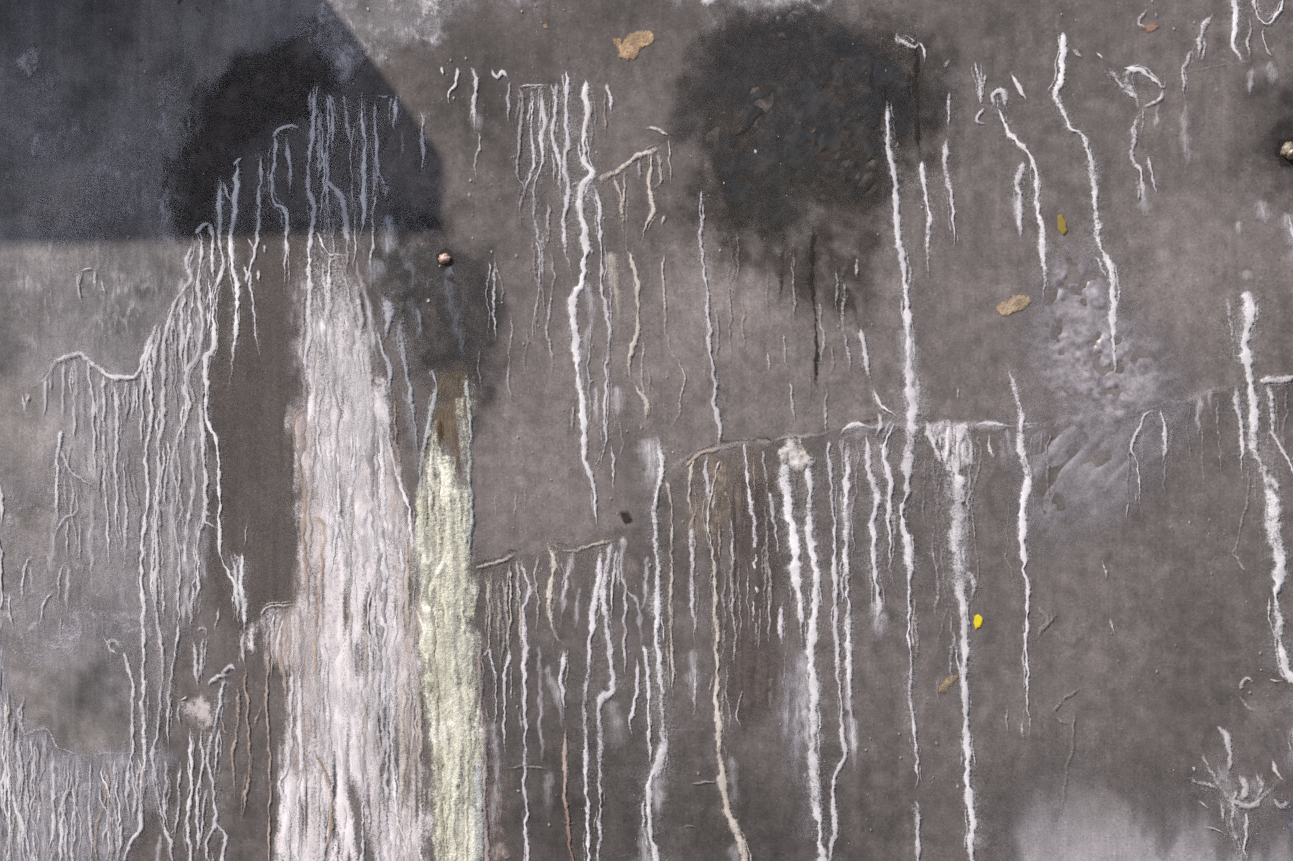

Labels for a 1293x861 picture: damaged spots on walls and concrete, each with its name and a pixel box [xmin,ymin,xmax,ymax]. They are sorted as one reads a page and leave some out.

water stain [415,0,441,26]
water stain [16,50,39,78]
water stain [332,27,356,77]
water stain [76,264,134,339]
water stain [62,362,77,411]
water stain [44,383,141,567]
water stain [0,487,40,544]
water stain [0,548,17,626]
water stain [14,548,82,656]